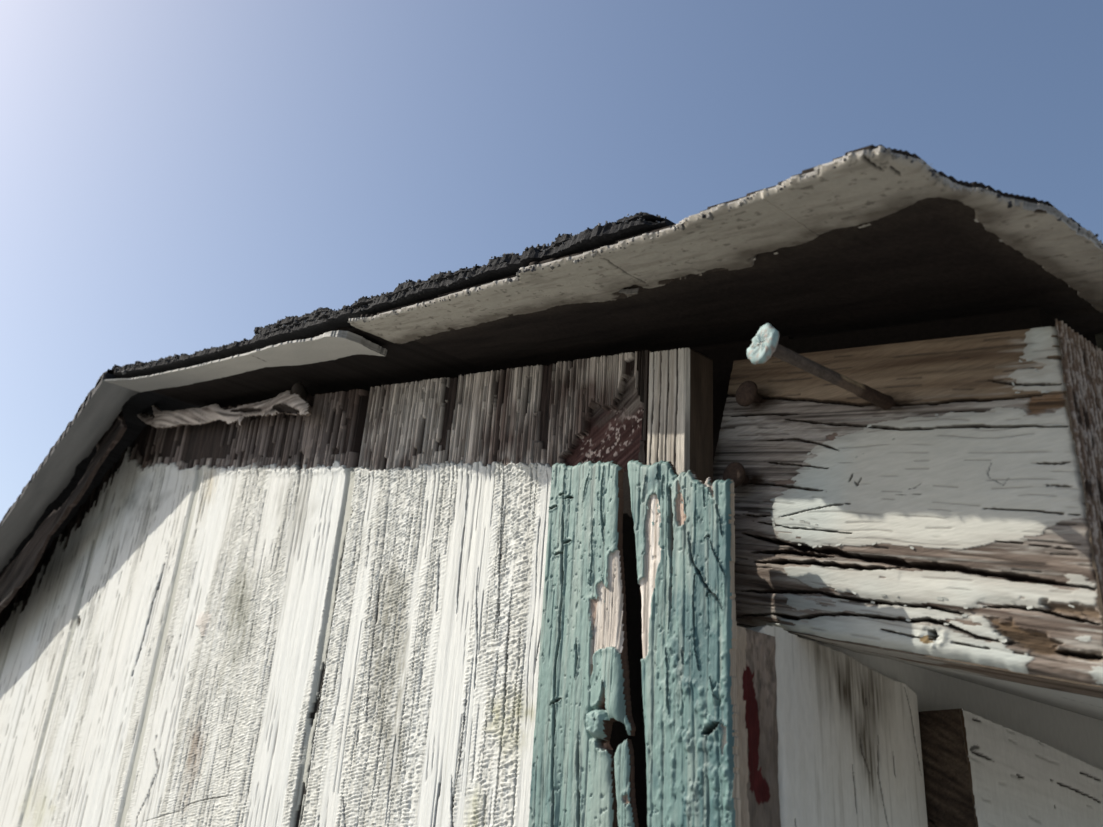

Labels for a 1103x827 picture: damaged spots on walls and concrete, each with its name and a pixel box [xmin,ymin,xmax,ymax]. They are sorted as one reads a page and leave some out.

peeling [130,350,648,471]
crack [643,350,678,498]
peeling [589,549,624,672]
peeling [638,492,661,658]
crack [669,379,1101,649]
peeling [701,327,1103,685]
crack [1056,649,1103,660]